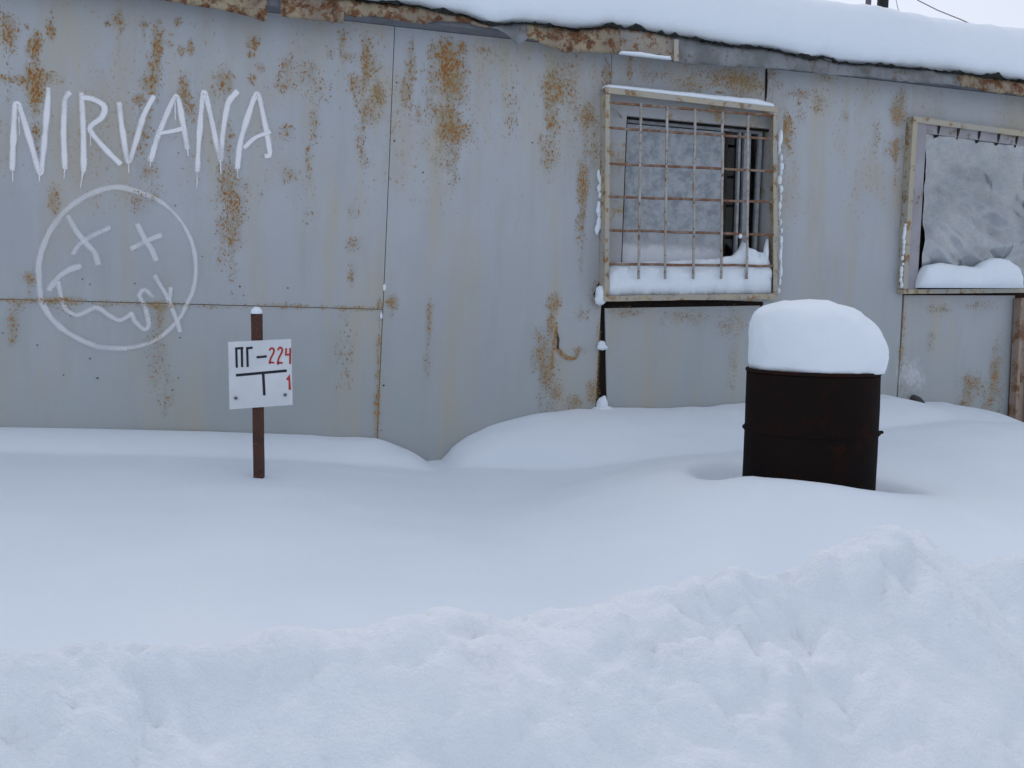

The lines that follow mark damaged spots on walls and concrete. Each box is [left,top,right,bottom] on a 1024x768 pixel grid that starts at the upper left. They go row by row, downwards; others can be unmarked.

corrosion [0,11,63,154]
corrosion [130,18,196,214]
corrosion [209,120,263,281]
corrosion [210,36,332,184]
corrosion [330,29,386,168]
corrosion [400,36,491,186]
corrosion [538,55,600,268]
corrosion [601,54,827,169]
corrosion [531,293,599,412]